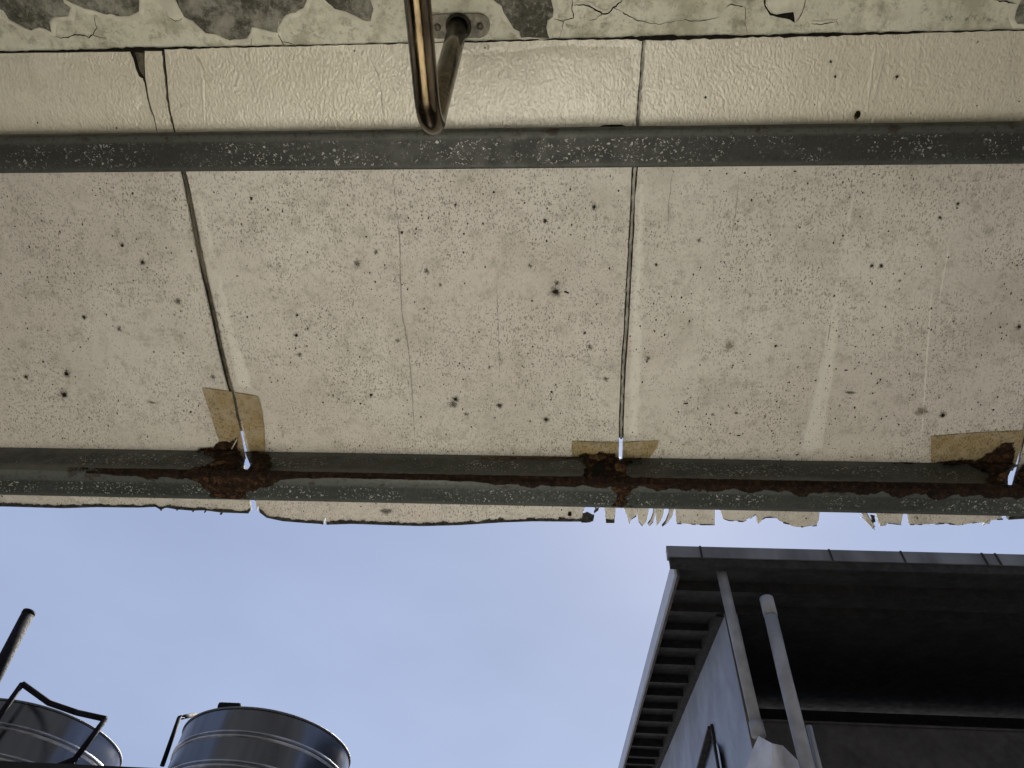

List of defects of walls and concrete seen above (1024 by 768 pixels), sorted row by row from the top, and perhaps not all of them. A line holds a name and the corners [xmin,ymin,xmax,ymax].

peeling [0,0,378,45]
peeling [487,0,558,40]
peeling [764,0,804,23]
peeling [1009,0,1024,29]
corrosion [73,438,1024,508]